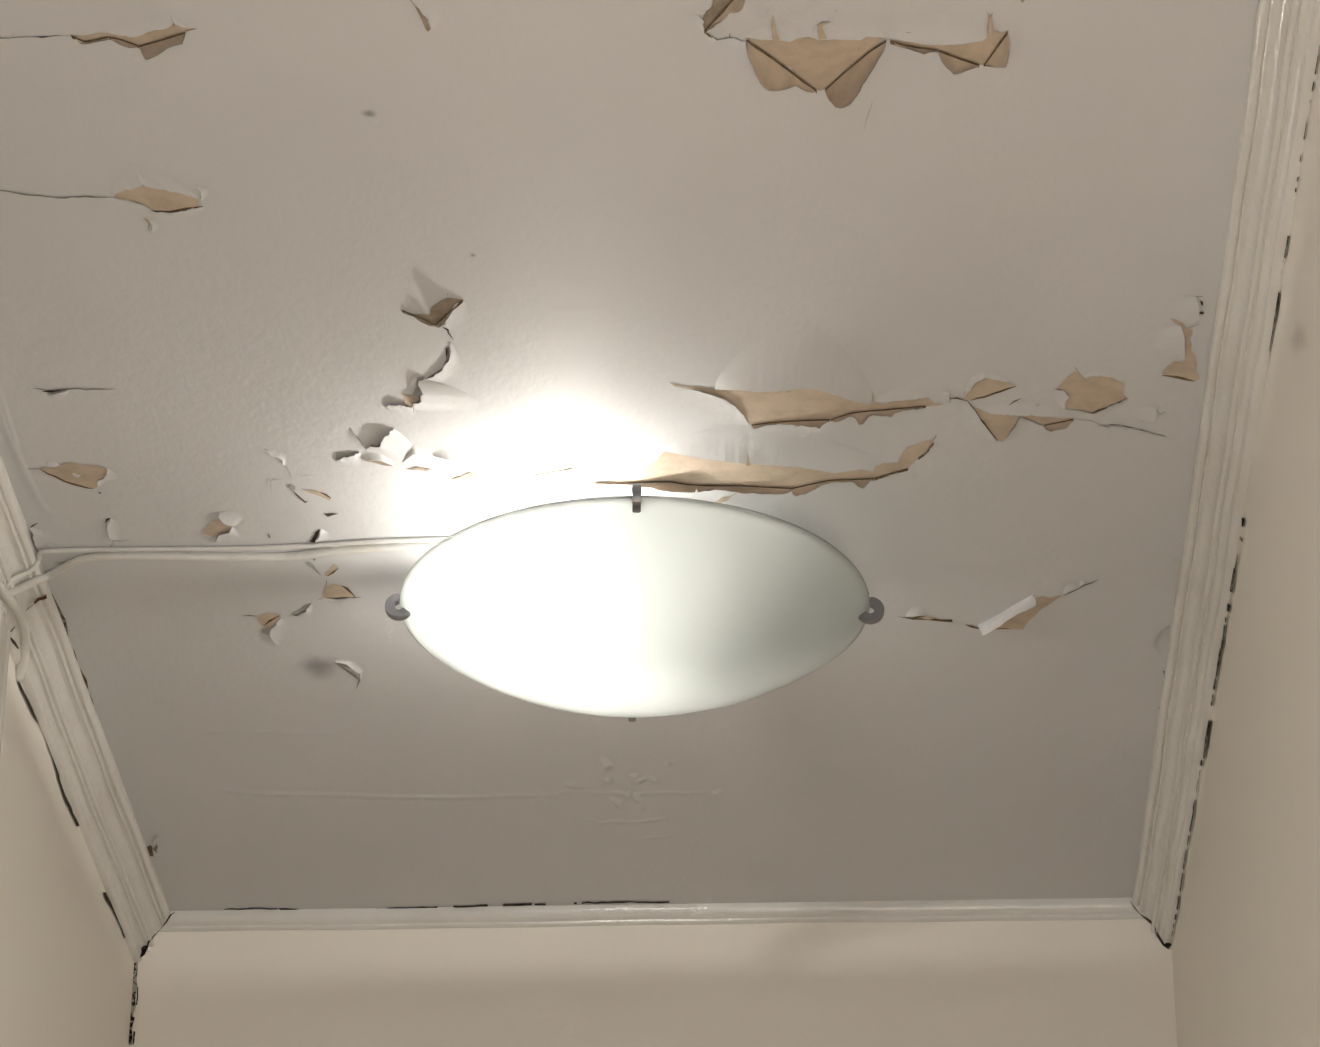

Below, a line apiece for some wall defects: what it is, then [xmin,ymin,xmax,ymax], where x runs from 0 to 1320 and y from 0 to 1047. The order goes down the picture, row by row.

peeling [0,11,194,60]
peeling [688,0,1011,129]
peeling [0,163,210,232]
peeling [401,294,469,340]
peeling [1149,296,1204,382]
peeling [335,325,1129,503]
peeling [39,459,118,494]
peeling [203,510,246,544]
peeling [244,559,361,645]
peeling [965,578,1099,635]
peeling [335,660,364,689]